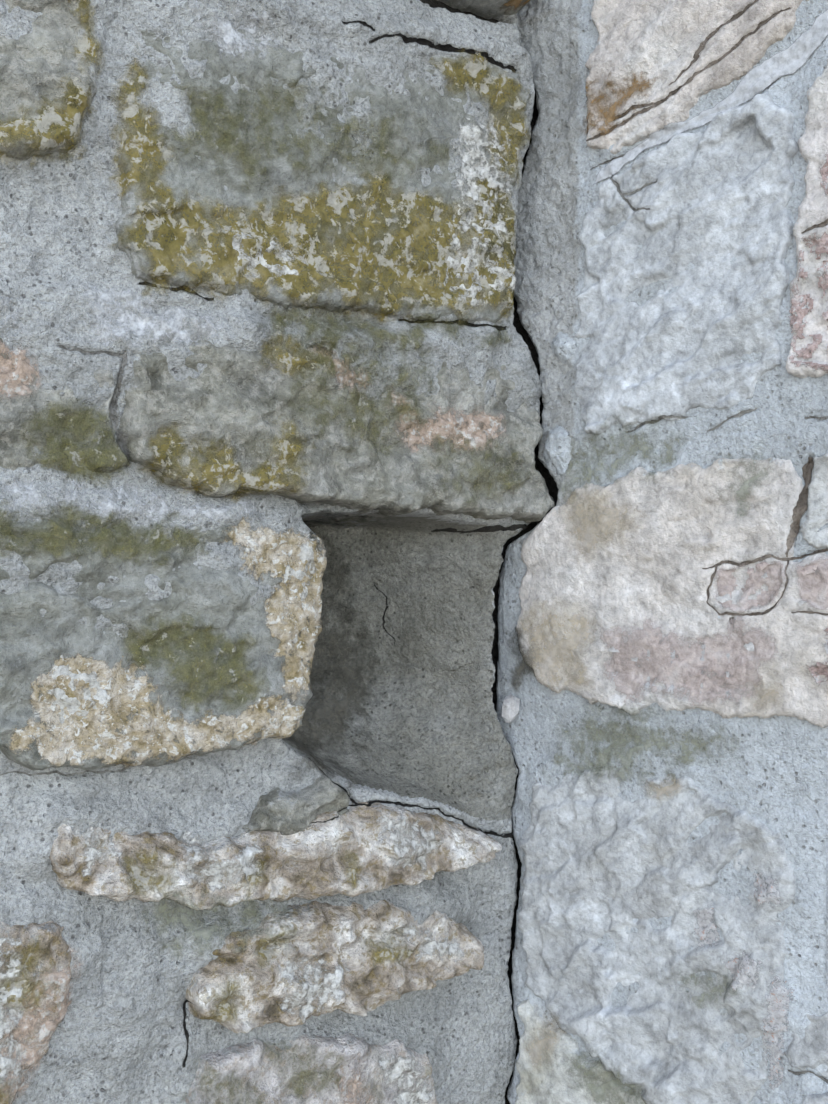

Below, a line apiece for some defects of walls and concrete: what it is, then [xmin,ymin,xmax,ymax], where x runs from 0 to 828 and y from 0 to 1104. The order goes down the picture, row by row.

crack [420,0,499,23]
crack [342,20,517,73]
crack [522,90,538,174]
crack [139,281,214,301]
crack [59,345,131,467]
crack [398,295,559,711]
crack [702,457,828,624]
crack [374,584,395,644]
crack [0,757,191,777]
crack [307,754,522,1104]
crack [183,1000,193,1067]